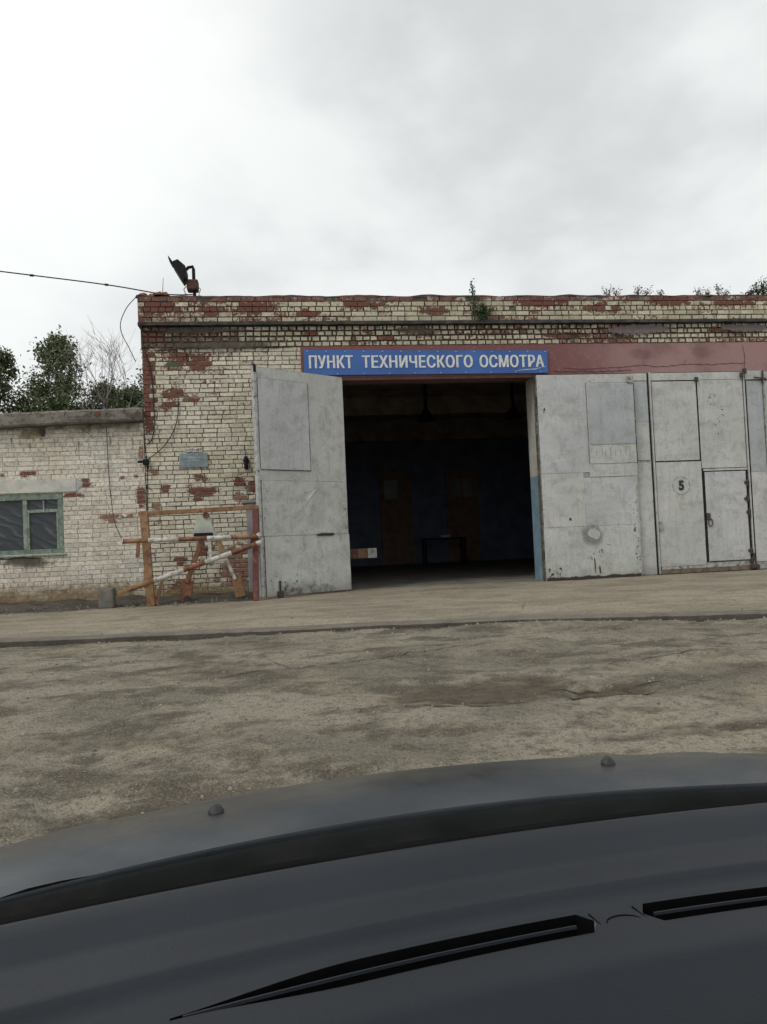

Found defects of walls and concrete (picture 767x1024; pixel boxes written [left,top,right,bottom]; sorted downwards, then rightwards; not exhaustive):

peeling [135,291,322,335]
peeling [344,297,389,311]
peeling [419,306,448,315]
peeling [513,297,568,309]
peeling [538,301,623,343]
peeling [647,296,692,305]
peeling [169,350,213,373]
peeling [138,327,200,460]
peeling [99,469,171,523]
peeling [185,474,221,501]